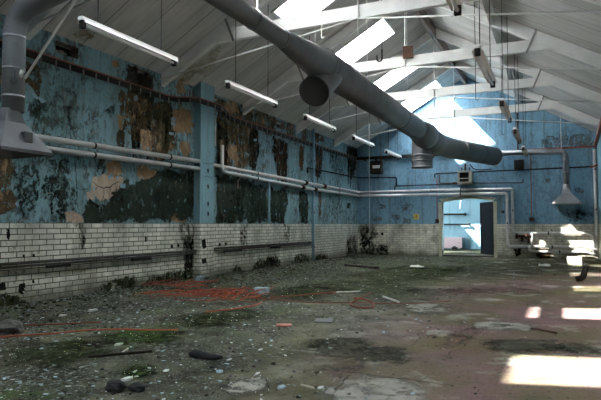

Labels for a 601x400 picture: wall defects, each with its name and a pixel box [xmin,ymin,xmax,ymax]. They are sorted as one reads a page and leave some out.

damp [32,87,76,134]
peeling [106,90,195,162]
peeling [214,99,277,188]
peeling [0,158,19,215]
spalling [86,160,126,201]
damp [78,167,194,279]
damp [215,127,290,255]